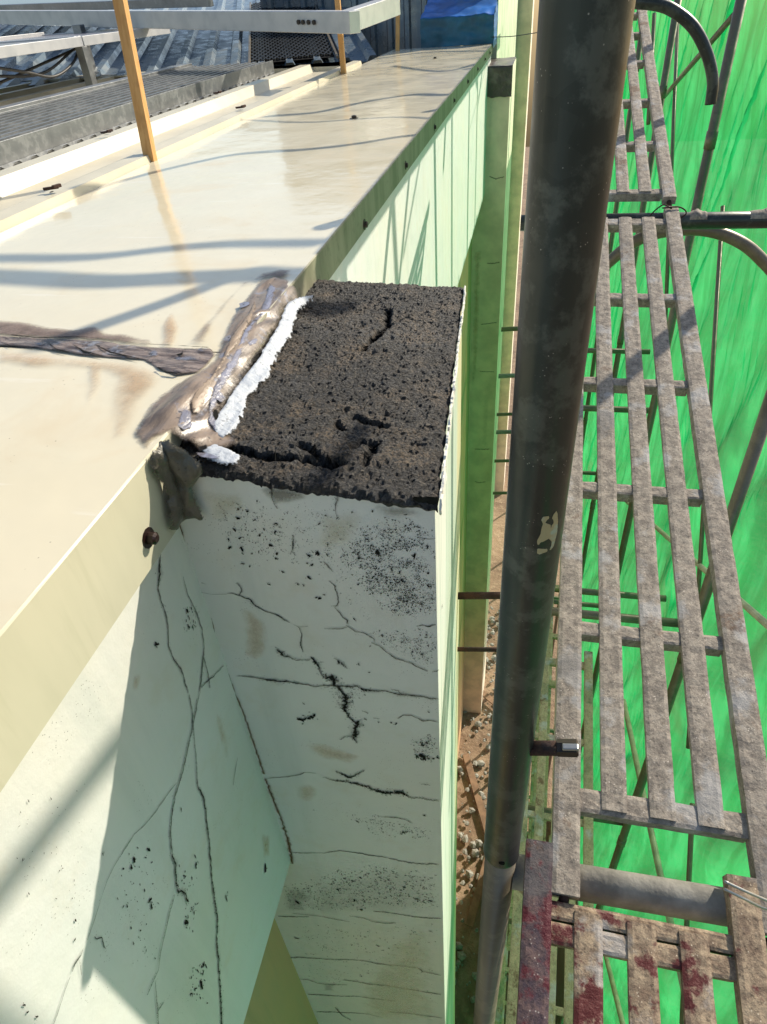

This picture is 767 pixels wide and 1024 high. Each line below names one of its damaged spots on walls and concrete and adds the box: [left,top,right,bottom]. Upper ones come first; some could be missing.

spalling [178,279,466,515]
leakage [212,501,437,662]
crack [55,554,440,1024]
leakage [284,867,436,911]